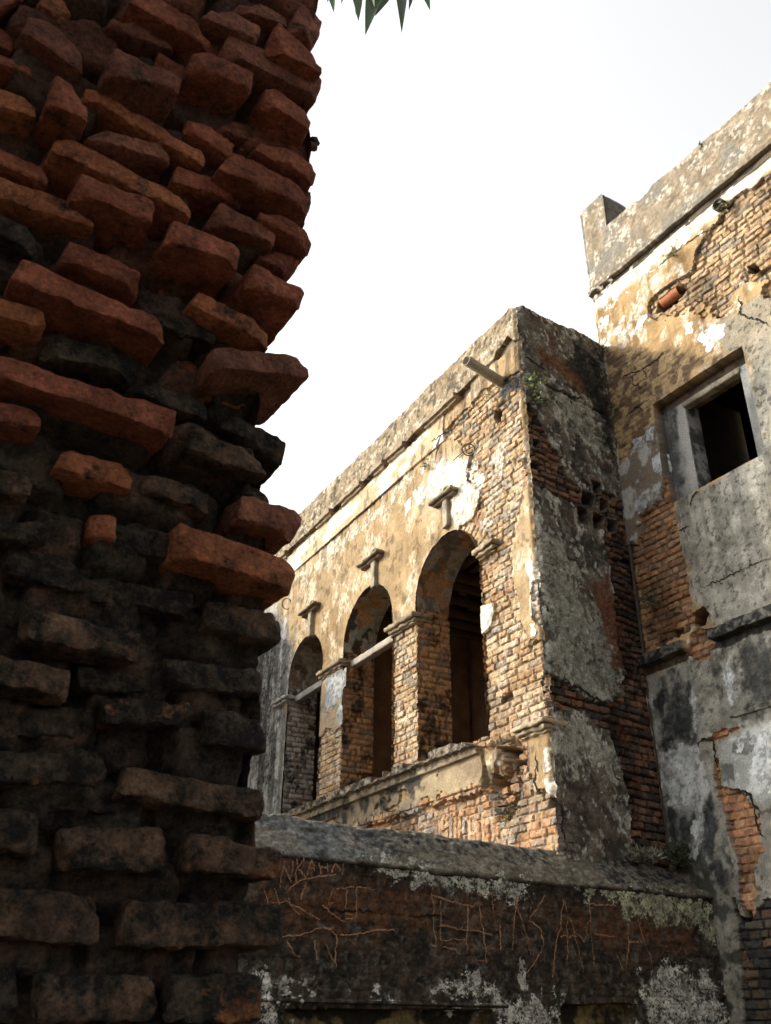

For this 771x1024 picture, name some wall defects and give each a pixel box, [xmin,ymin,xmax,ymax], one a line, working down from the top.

flaking render [590,176,771,352]
crack [737,296,770,327]
water stain [566,340,615,451]
flaking render [295,372,716,871]
crack [703,560,766,588]
water stain [647,673,703,750]
water stain [712,642,771,721]
crack [533,754,566,840]
water stain [667,792,729,894]
flaking render [713,727,771,1024]